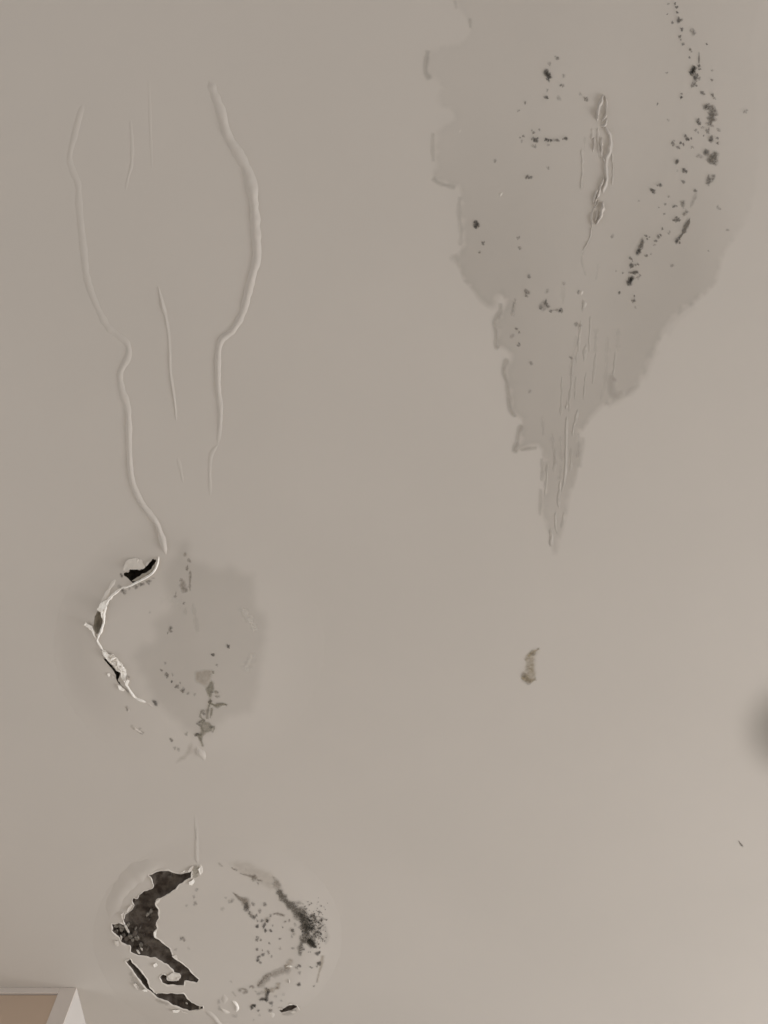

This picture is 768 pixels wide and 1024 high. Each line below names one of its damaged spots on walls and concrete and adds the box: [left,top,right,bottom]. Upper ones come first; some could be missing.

mould [672,94,718,184]
peeling [84,557,159,712]
damp [195,671,226,761]
spalling [111,865,204,1014]
mould [277,890,323,965]